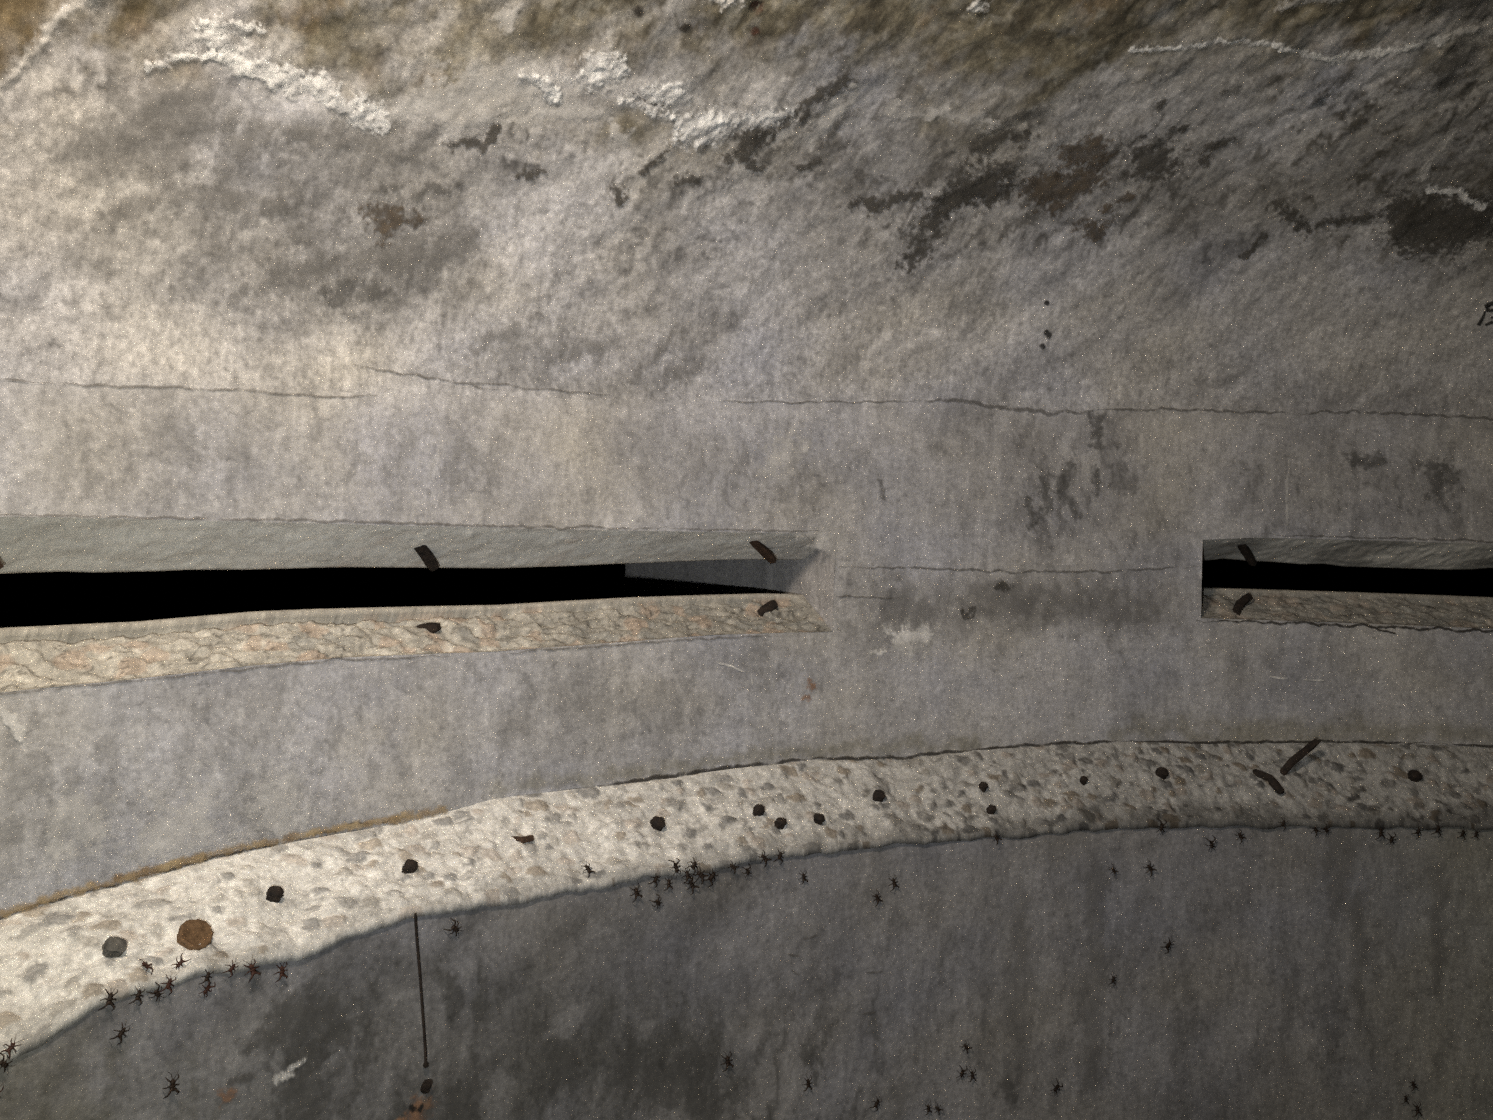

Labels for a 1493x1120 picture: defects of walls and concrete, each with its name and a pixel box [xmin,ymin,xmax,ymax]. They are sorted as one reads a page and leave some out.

leakage [497,6,519,32]
leakage [1128,0,1493,84]
leakage [144,14,865,176]
leakage [358,183,459,247]
leakage [516,164,547,180]
leakage [610,184,629,206]
leakage [673,175,700,186]
leakage [848,99,1237,275]
leakage [1238,137,1493,262]